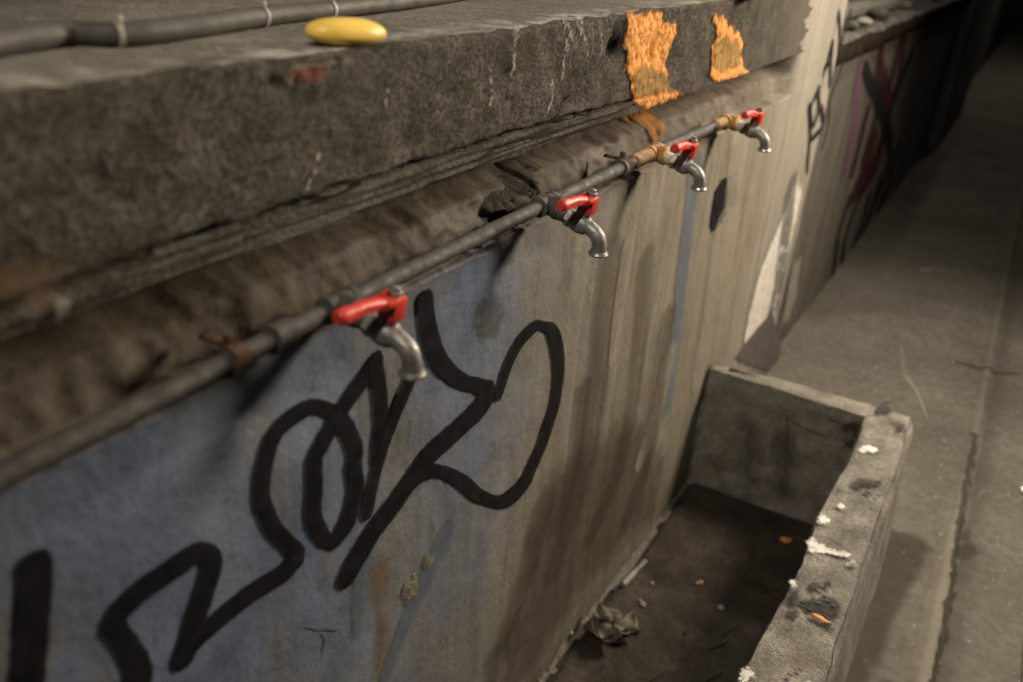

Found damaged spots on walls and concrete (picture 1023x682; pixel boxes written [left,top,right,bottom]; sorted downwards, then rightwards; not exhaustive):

corrosion [621,10,691,169]
corrosion [710,13,749,82]
leakage [609,237,634,365]
leakage [693,131,745,390]